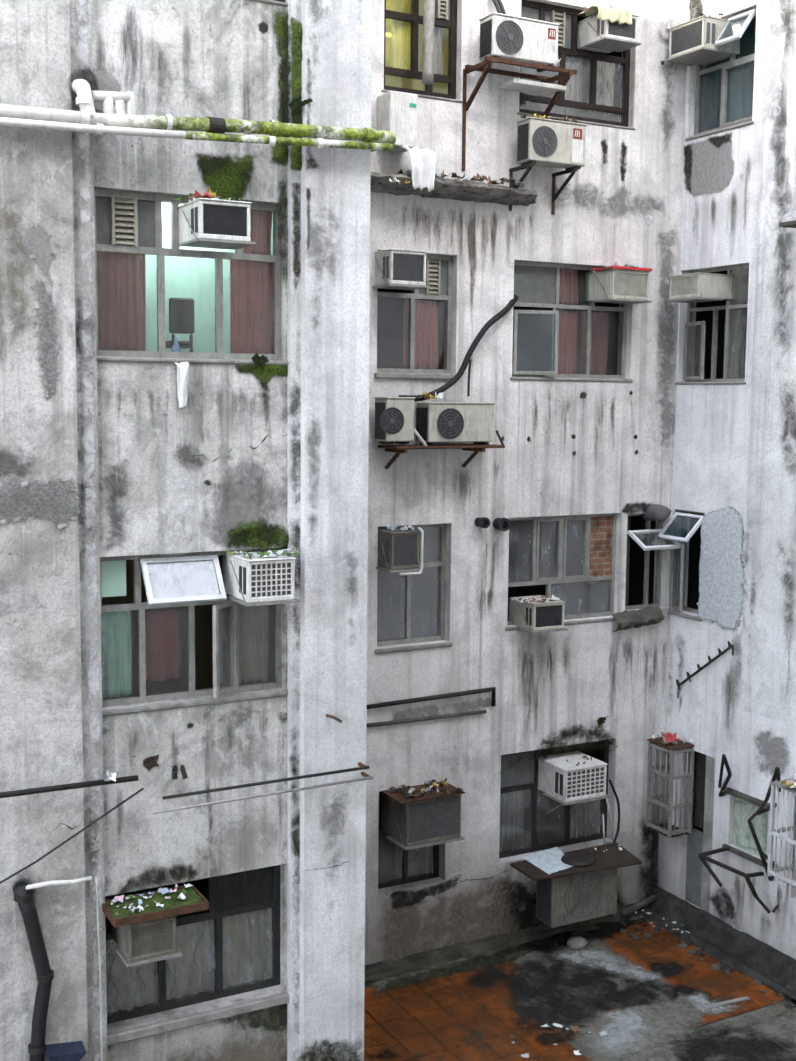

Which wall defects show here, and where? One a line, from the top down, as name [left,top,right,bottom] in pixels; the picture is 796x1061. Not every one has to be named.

leakage [689,0,703,20]
leakage [663,100,674,137]
peeling [701,583,744,629]
leakage [558,950,660,980]